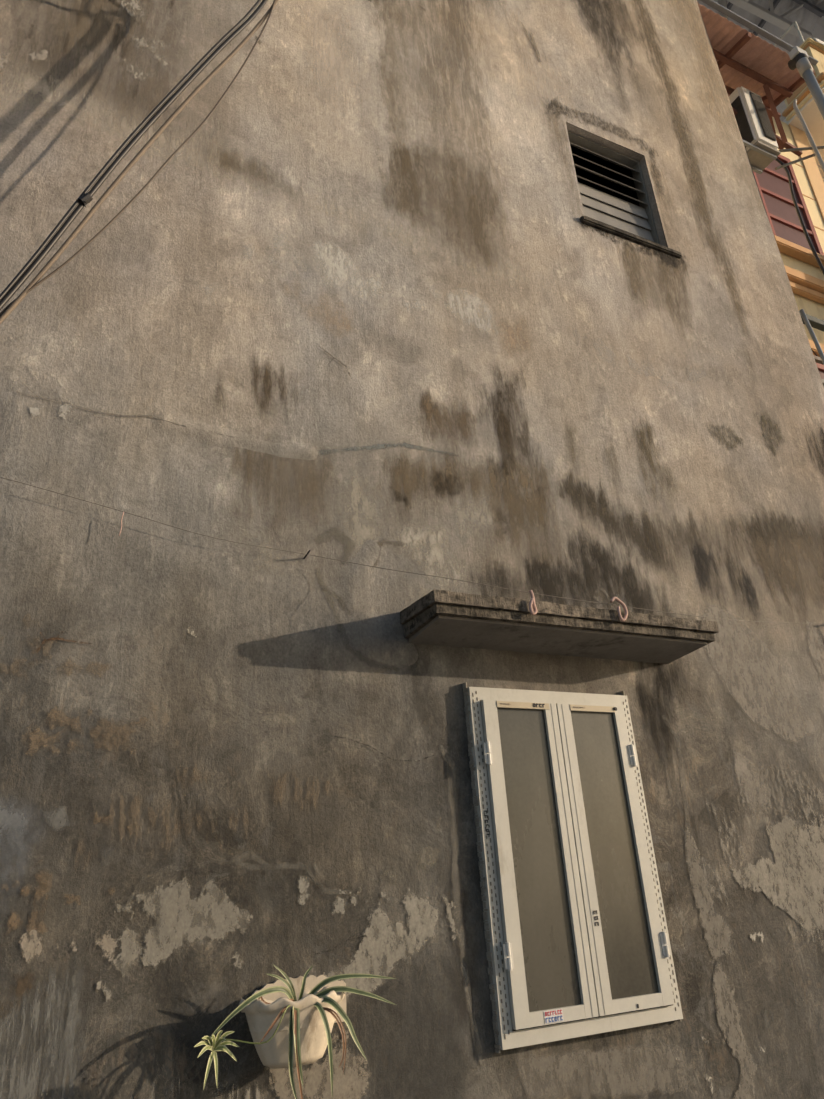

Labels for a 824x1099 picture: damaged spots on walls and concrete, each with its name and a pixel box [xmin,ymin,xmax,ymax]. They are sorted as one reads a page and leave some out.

damp [548,100,661,191]
damp [606,0,709,223]
crack [16,368,186,427]
damp [321,374,547,537]
damp [347,479,466,586]
damp [528,537,649,611]
damp [561,475,717,585]
peeling [7,911,47,962]
peeling [96,878,253,977]
peeling [298,876,310,906]
peeling [325,887,456,996]
peeling [684,766,824,1099]